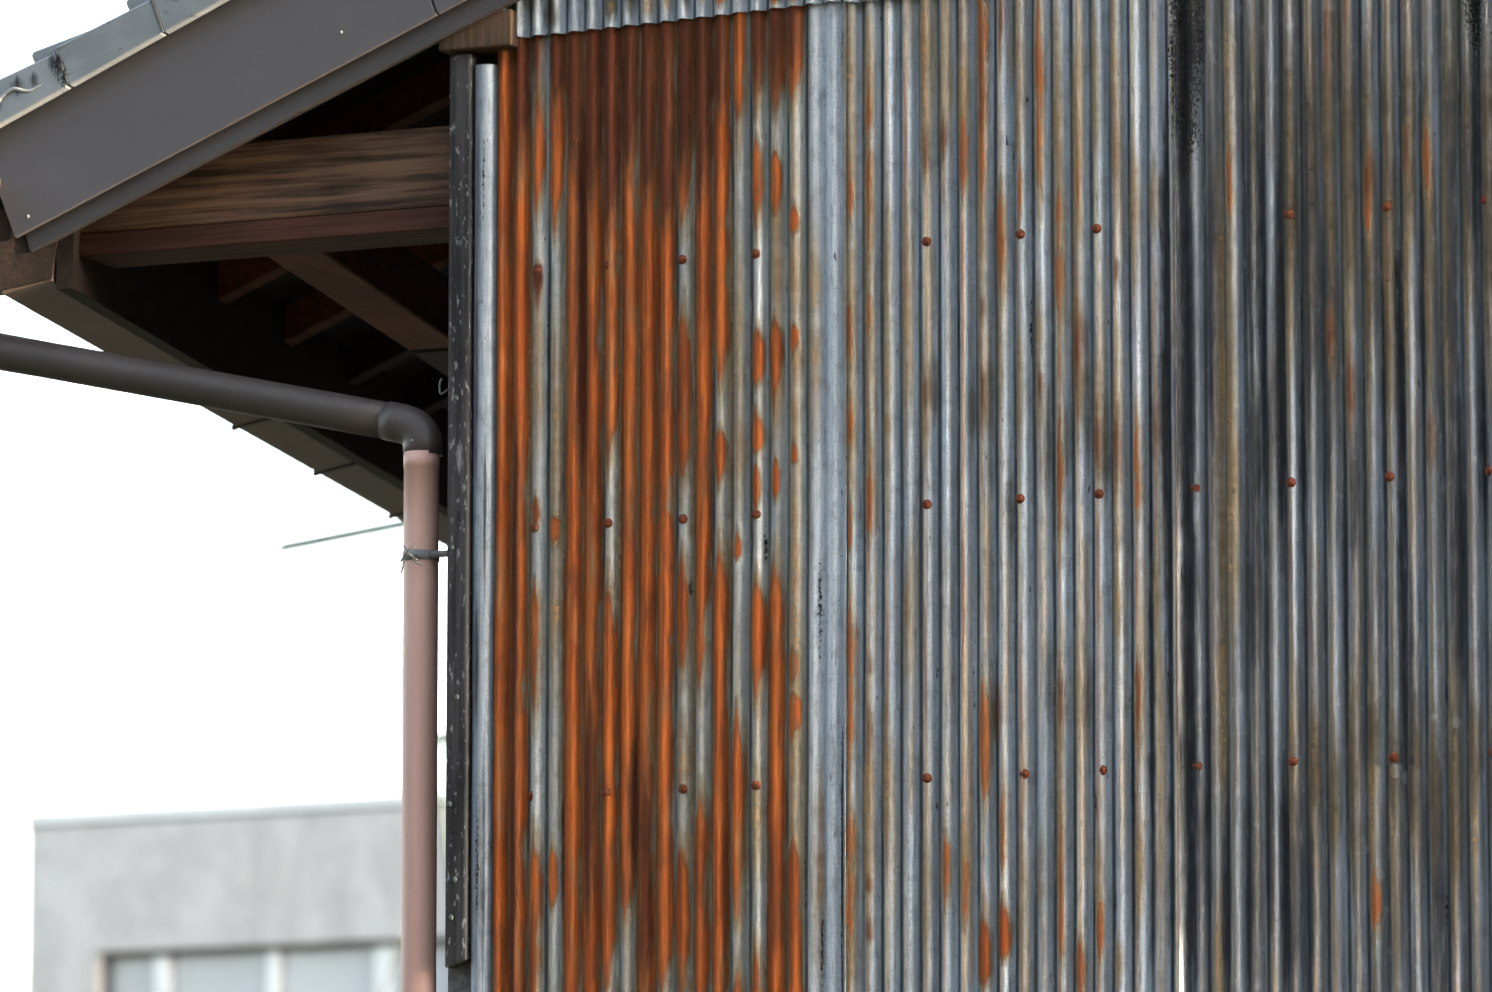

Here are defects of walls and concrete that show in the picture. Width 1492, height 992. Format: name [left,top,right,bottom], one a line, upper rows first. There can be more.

rust [492,0,825,992]
rust [843,5,876,553]
rust [844,575,875,992]